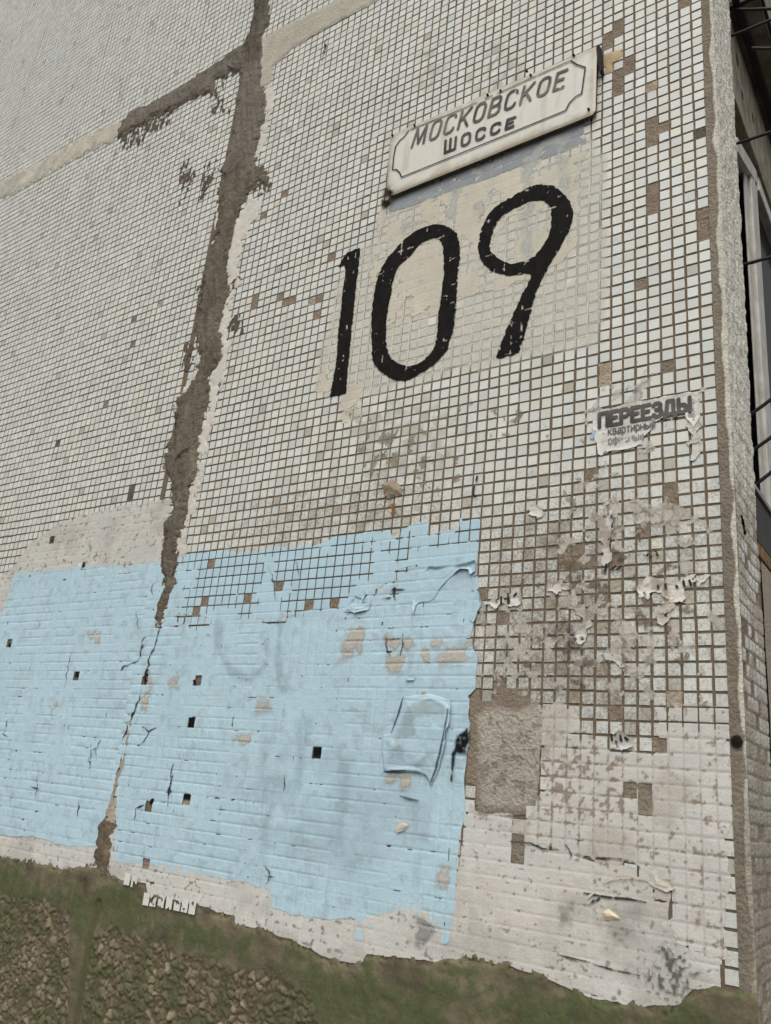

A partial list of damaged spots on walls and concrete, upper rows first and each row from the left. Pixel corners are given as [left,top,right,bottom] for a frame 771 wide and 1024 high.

crack [77,0,272,878]
spalling [664,482,678,509]
spalling [637,524,651,538]
spalling [559,543,597,571]
peeling [330,591,371,613]
peeling [412,560,476,612]
peeling [469,588,488,622]
spalling [497,611,510,625]
peeling [341,626,364,659]
peeling [384,634,471,680]
spalling [466,678,545,815]
peeling [416,918,432,945]